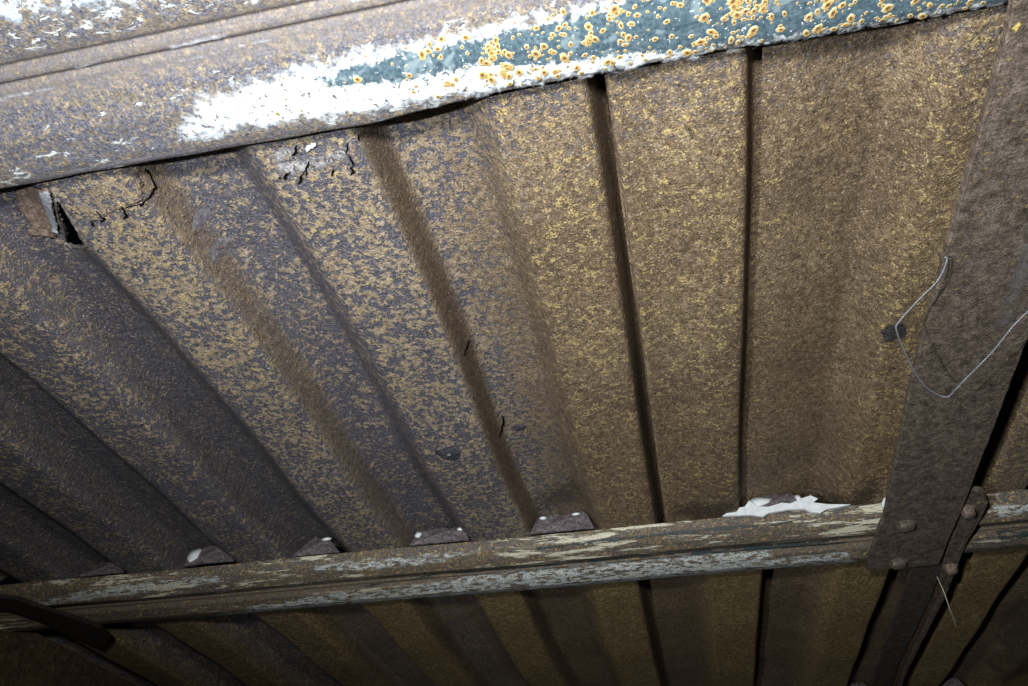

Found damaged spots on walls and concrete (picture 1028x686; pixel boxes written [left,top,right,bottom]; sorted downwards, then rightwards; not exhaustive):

peeling [180,0,1007,142]
crack [278,134,359,184]
peeling [723,494,851,518]
peeling [187,548,202,563]
peeling [35,576,224,605]
peeling [193,549,858,618]